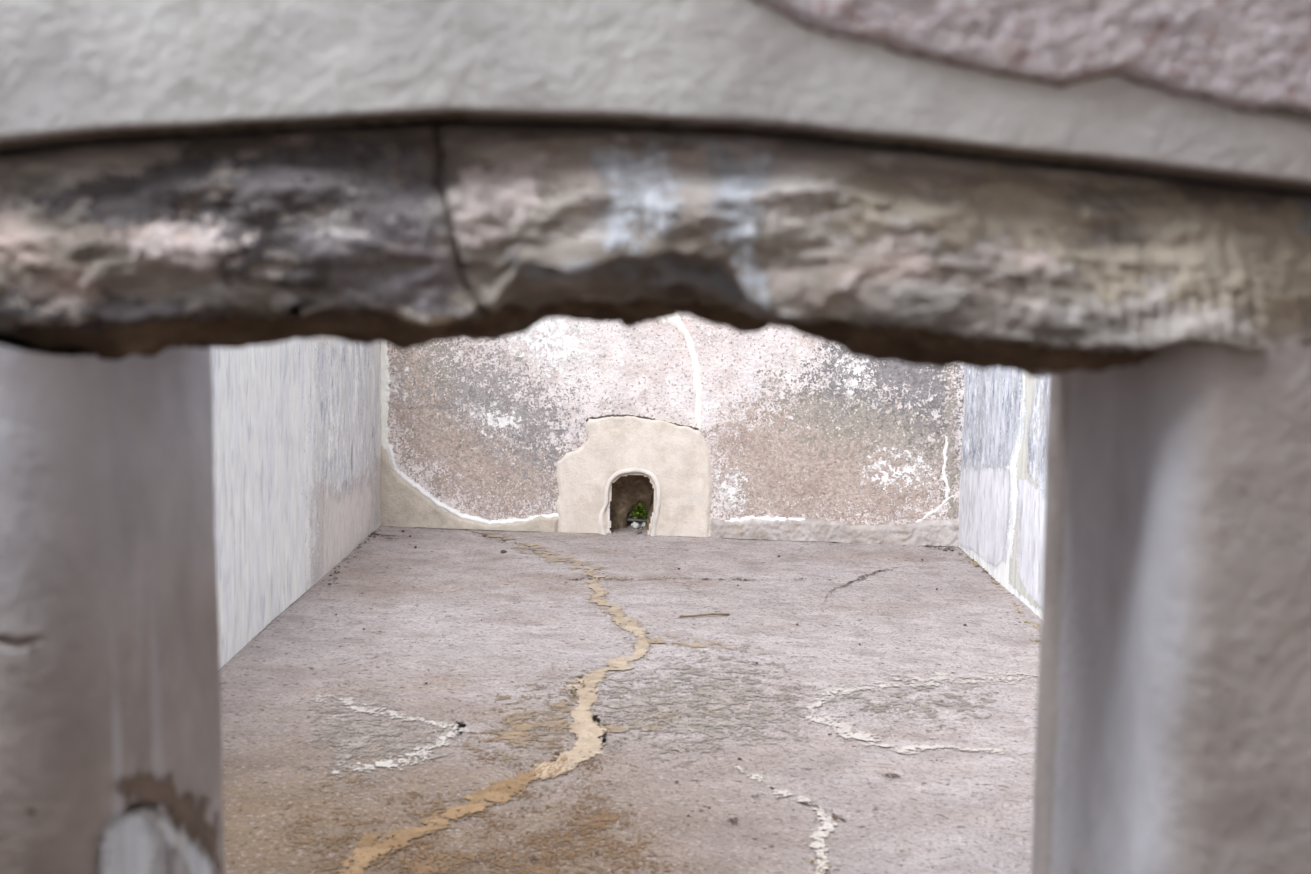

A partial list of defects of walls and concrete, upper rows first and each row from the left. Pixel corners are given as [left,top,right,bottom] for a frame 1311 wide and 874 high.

flaking render [757,0,1311,122]
damp [118,210,259,279]
damp [445,127,781,320]
damp [811,152,1311,343]
crack [586,314,703,442]
peeling [958,366,1050,607]
crack [0,636,41,650]
crack [310,693,471,776]
crack [335,531,755,874]
crack [794,567,899,611]
flaking render [94,805,222,874]
crack [733,765,846,874]